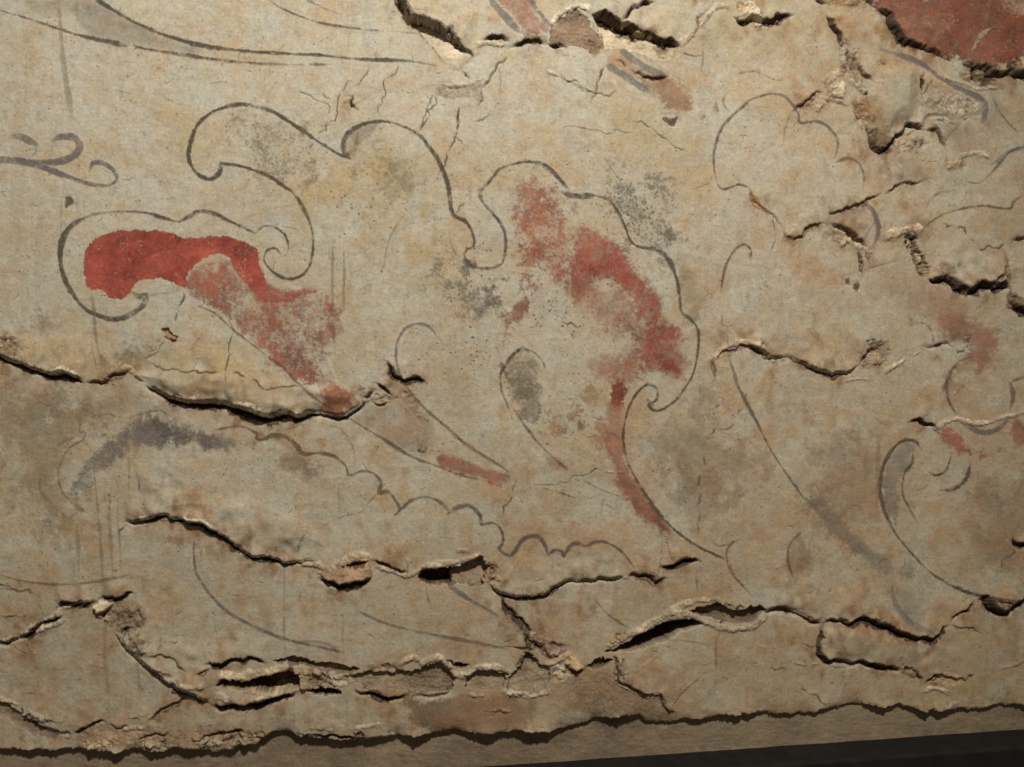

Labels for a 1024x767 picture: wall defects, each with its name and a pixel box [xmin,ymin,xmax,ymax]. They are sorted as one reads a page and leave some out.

flaking render [549,0,678,62]
crack [681,0,790,56]
crack [816,0,1024,155]
crack [750,192,878,272]
crack [930,224,1024,296]
crack [0,318,373,427]
crack [119,512,309,566]
flaking render [209,597,767,719]
crack [771,595,1024,681]